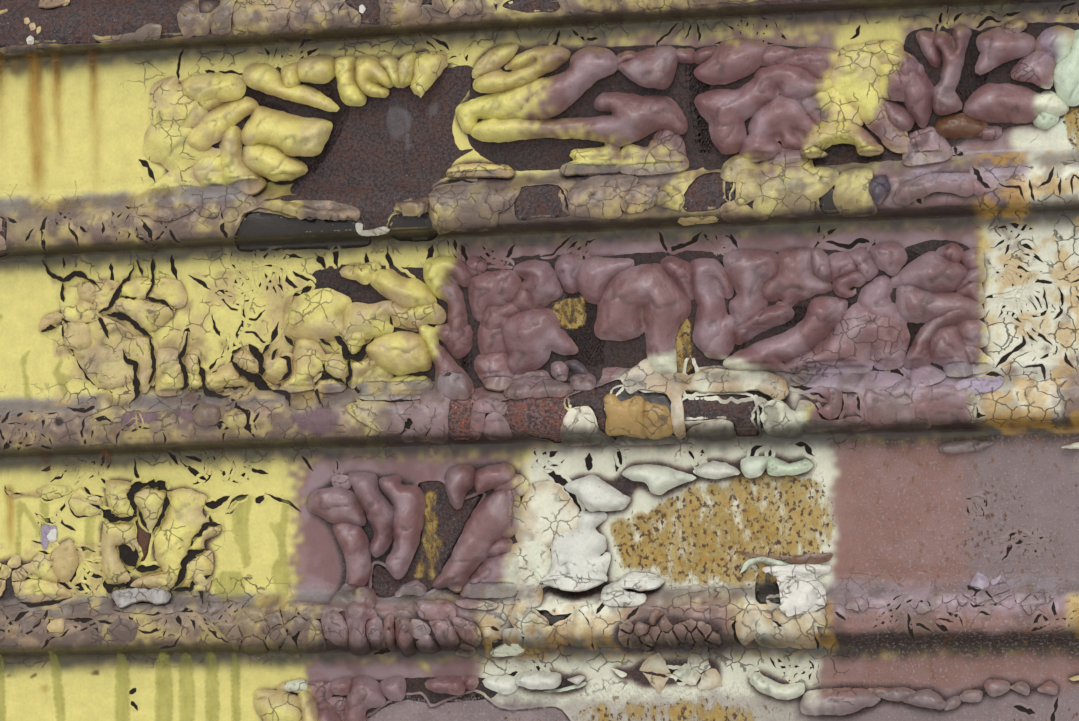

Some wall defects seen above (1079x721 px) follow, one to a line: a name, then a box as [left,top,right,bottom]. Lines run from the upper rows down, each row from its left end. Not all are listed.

peeling [0,0,673,56]
rust [30,63,40,177]
peeling [135,65,993,255]
crack [985,166,1079,381]
peeling [218,358,1005,694]
rust [611,473,835,588]
crack [833,572,1079,641]
peeling [909,582,1054,615]
peeling [999,525,1054,563]
peeling [366,670,587,721]